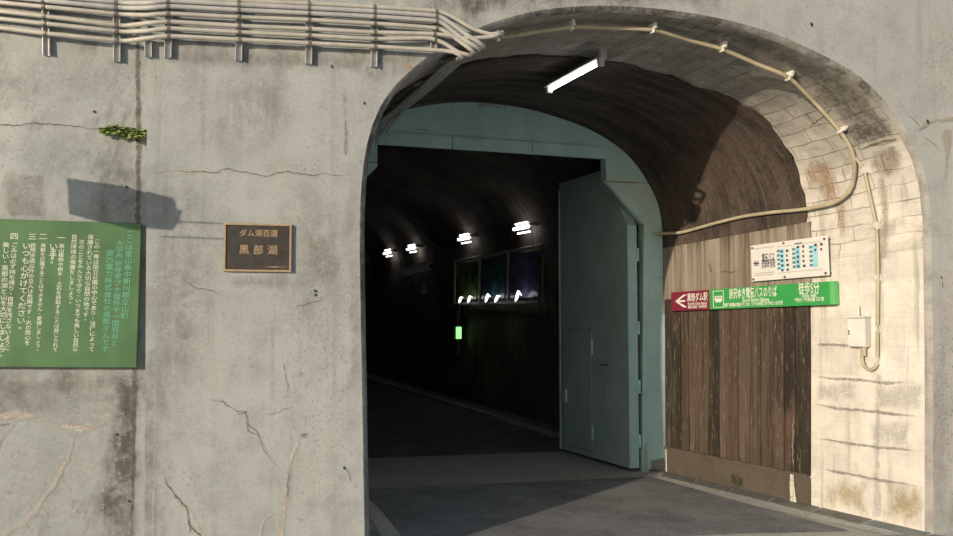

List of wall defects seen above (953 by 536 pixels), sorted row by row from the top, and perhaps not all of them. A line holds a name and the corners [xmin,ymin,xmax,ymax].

crack [0,121,97,129]
crack [134,5,142,223]
crack [168,168,336,177]
crack [0,410,100,444]
crack [129,368,137,530]
crack [219,399,269,457]
crack [165,478,205,536]